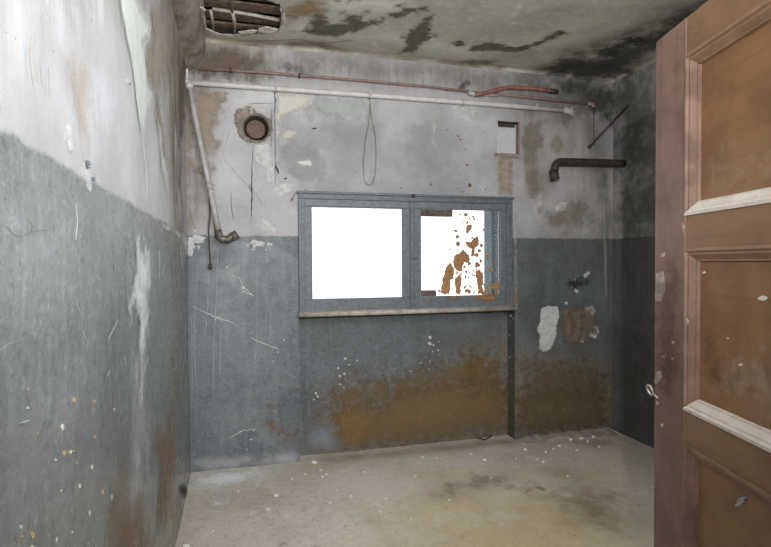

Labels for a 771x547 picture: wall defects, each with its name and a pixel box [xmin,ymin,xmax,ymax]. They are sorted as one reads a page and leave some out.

damp [288,1,432,52]
damp [452,30,566,64]
flaking render [234,104,293,195]
damp [522,122,542,198]
peeling [537,302,569,352]
peeling [580,304,599,343]